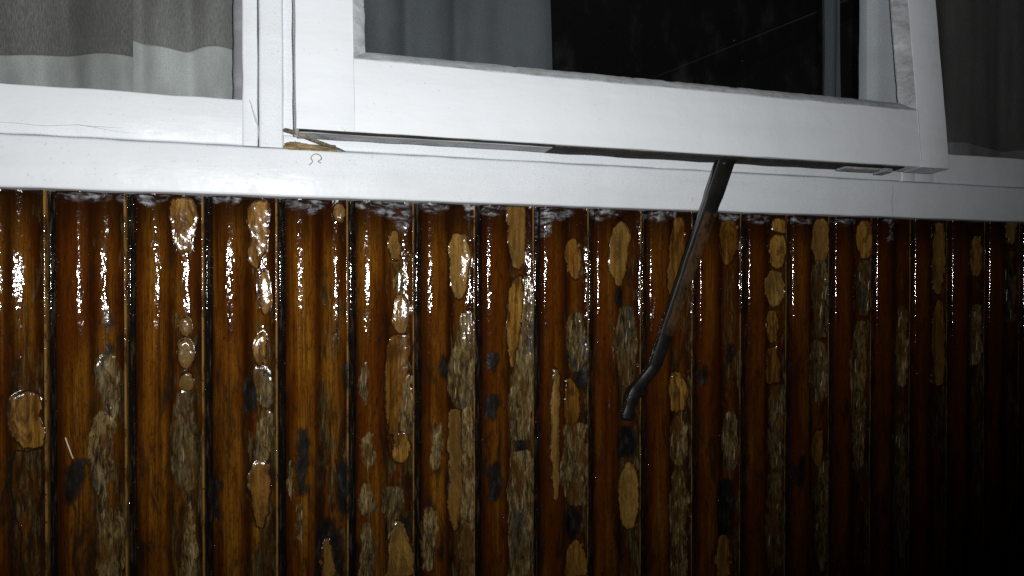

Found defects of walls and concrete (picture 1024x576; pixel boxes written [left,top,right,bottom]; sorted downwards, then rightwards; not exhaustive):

peeling [168,196,200,256]
peeling [246,198,273,315]
peeling [447,232,473,301]
peeling [504,206,527,369]
peeling [608,221,633,288]
peeling [763,217,787,385]
peeling [251,330,268,367]
peeling [383,293,412,464]
peeling [5,390,46,450]
leakage [63,458,86,505]
leakage [295,429,310,496]
peeling [616,460,640,530]